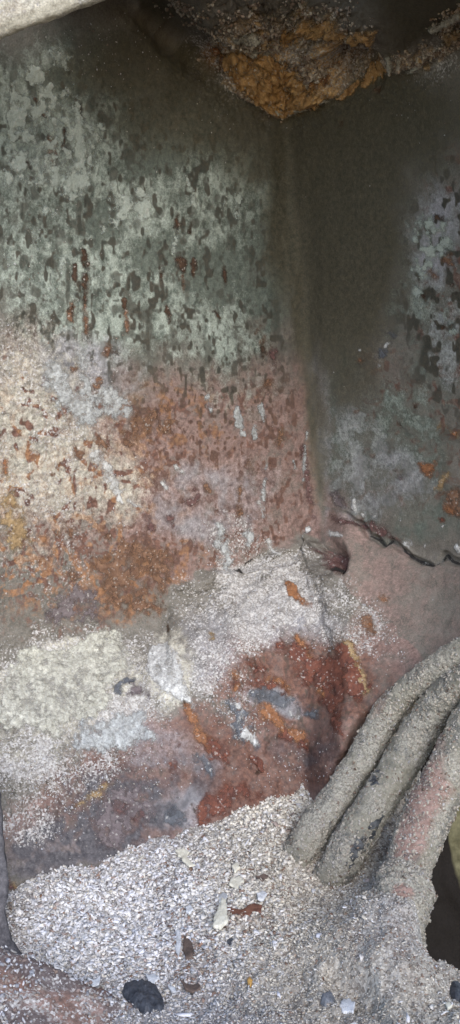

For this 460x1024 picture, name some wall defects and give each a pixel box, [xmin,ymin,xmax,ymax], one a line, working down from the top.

rust [212,20,429,119]
rust [67,248,90,334]
rust [175,257,198,290]
rust [73,435,110,460]
rust [184,483,212,507]
water stain [329,490,409,547]
crack [345,503,460,566]
rust [45,533,177,625]
rust [285,580,312,605]
rust [232,634,372,752]
rust [183,702,230,764]
rust [194,782,263,827]